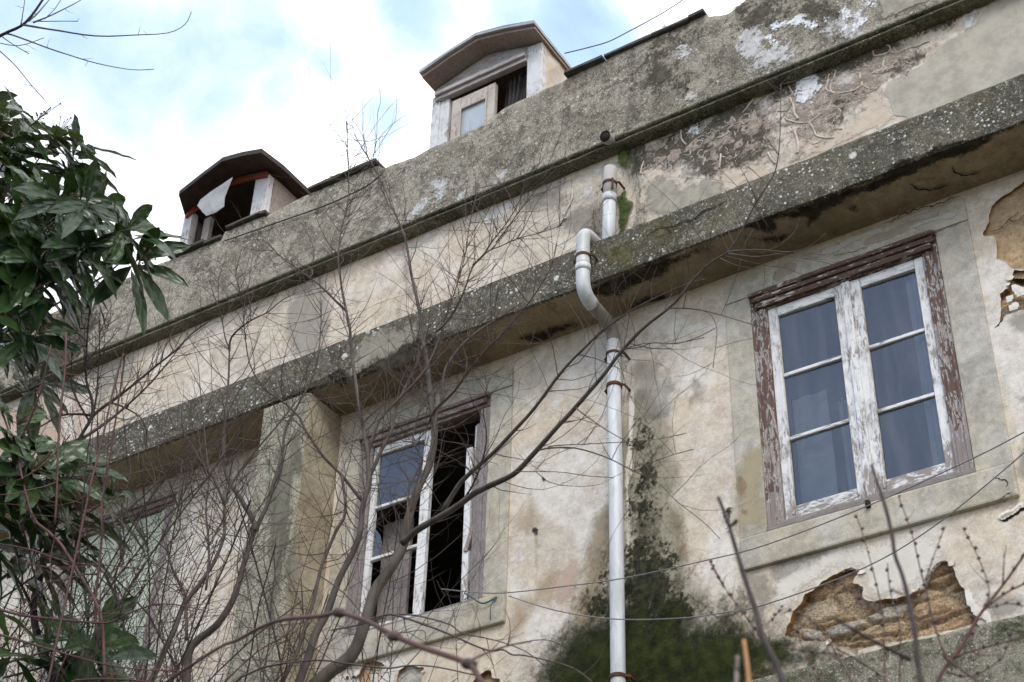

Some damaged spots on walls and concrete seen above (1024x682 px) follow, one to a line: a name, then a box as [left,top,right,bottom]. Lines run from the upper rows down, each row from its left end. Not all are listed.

flaking render [714,165,771,191]
leakage [622,0,978,227]
flaking render [796,90,894,160]
leakage [745,120,1024,242]
flaking render [982,181,1024,323]
leakage [575,507,610,626]
leakage [622,393,703,627]
flaking render [784,560,991,651]